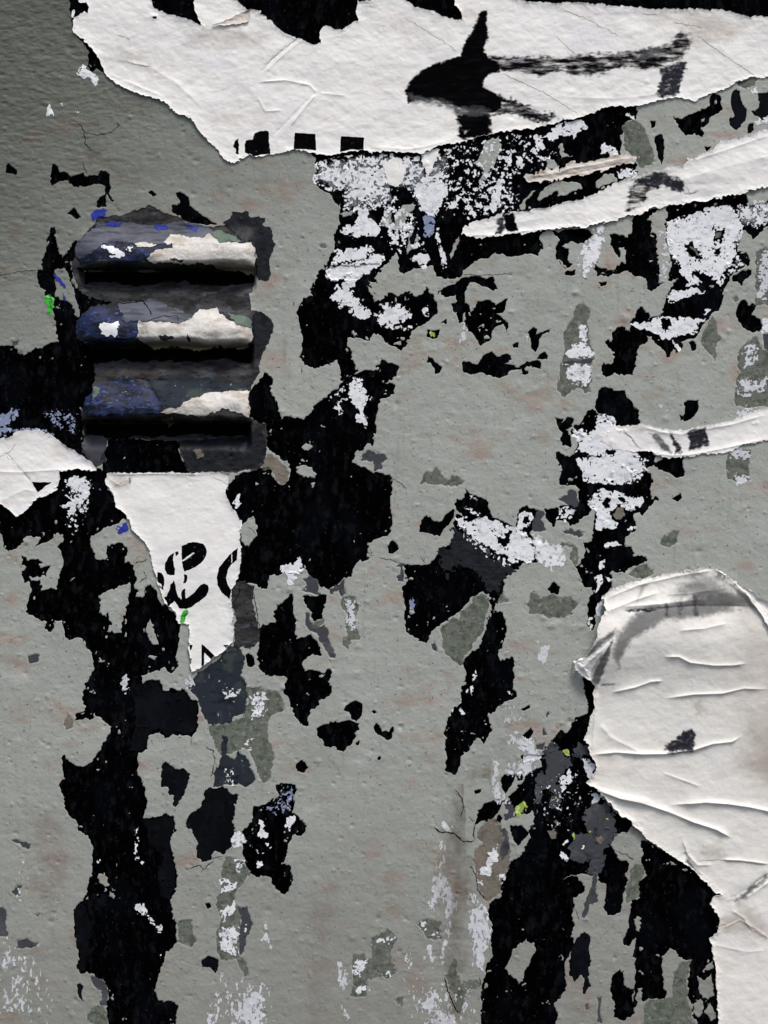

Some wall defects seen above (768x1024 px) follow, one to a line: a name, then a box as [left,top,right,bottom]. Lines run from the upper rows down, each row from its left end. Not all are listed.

peeling [69,0,106,75]
peeling [151,0,201,25]
peeling [238,0,370,45]
peeling [406,0,462,20]
peeling [524,0,768,18]
peeling [673,77,768,151]
peeling [552,194,768,408]
peeling [0,105,665,1024]
peeling [445,678,721,1024]